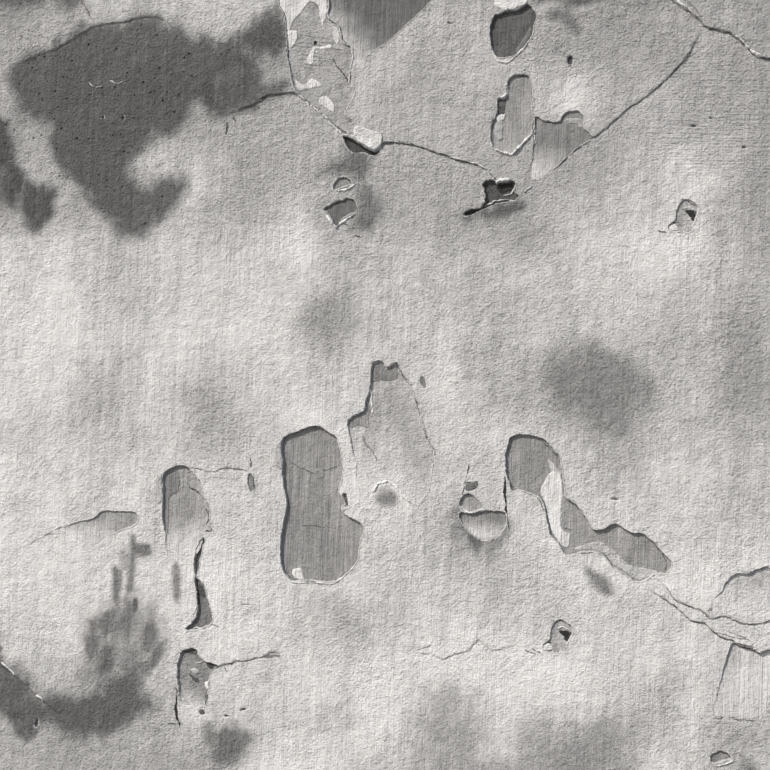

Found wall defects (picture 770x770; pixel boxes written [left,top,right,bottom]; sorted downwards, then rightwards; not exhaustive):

water stain [0,120,55,230]
water stain [11,11,287,235]
flaking render [277,0,431,157]
flaking render [488,0,538,63]
flaking render [463,73,594,217]
crack [594,0,770,137]
flaking render [155,464,216,632]
flaking render [274,425,365,584]
flaking render [346,359,435,507]
flaking render [457,433,673,583]
water stain [0,536,161,736]
flaking render [176,647,221,714]